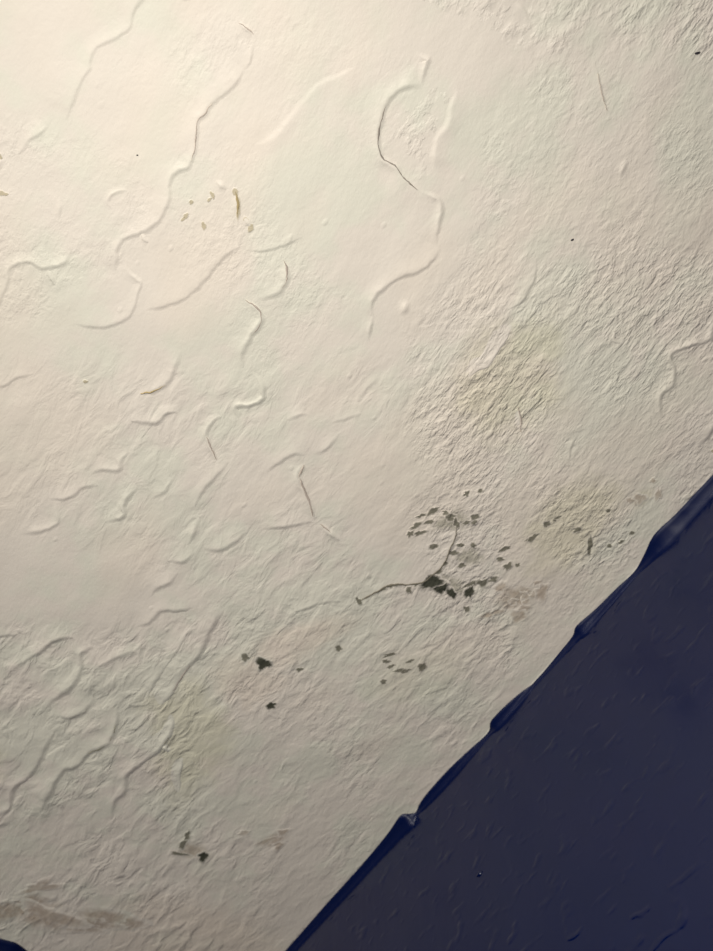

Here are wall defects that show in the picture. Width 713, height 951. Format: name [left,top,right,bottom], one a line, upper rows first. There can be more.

water stain [420,283,594,478]
water stain [379,452,666,626]
water stain [116,642,311,865]
water stain [330,628,503,729]
water stain [0,873,307,951]